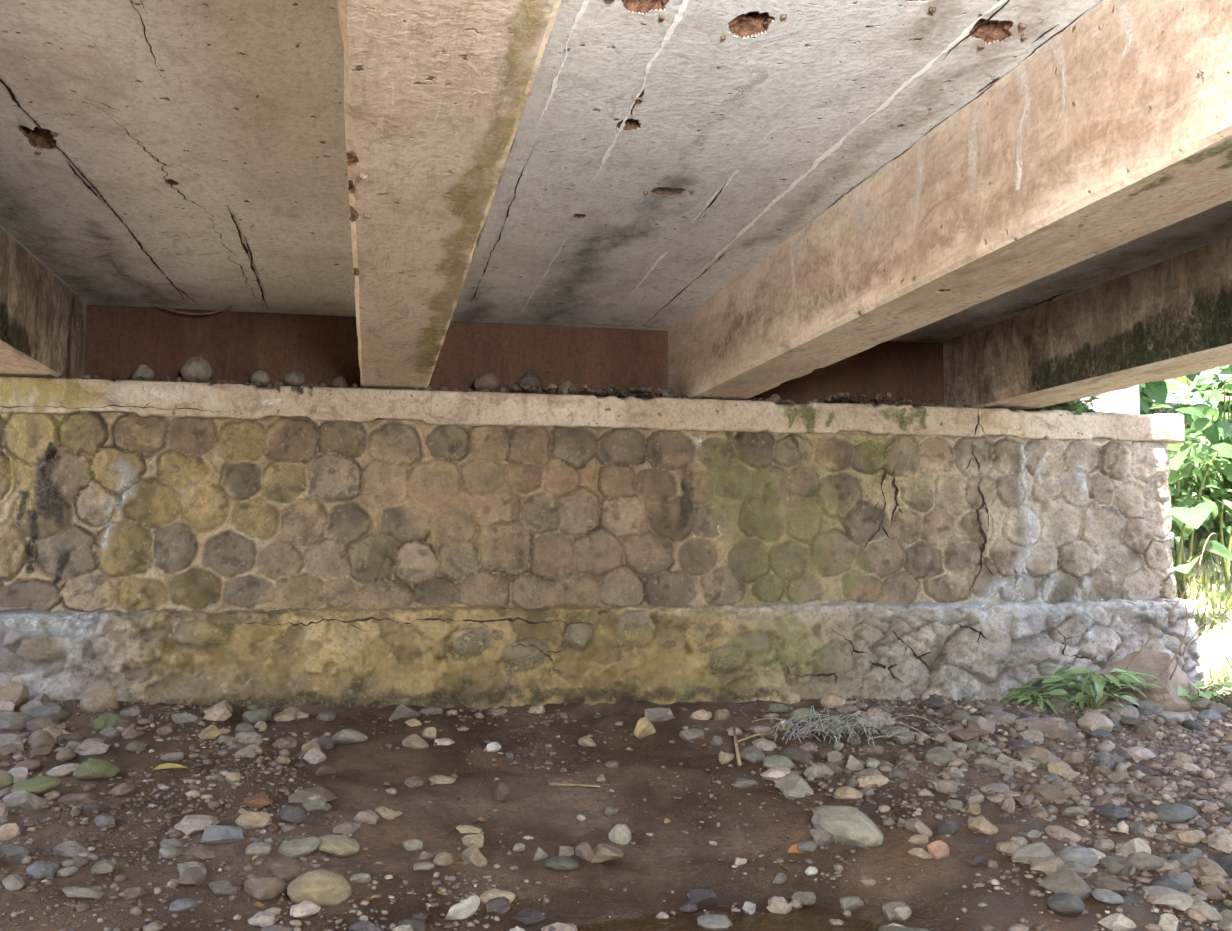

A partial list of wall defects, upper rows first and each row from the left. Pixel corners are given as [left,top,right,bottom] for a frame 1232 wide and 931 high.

crack [0,79,198,304]
crack [88,99,268,309]
crack [470,0,589,314]
leakage [1131,322,1146,367]
leakage [1209,289,1232,348]
crack [864,439,902,548]